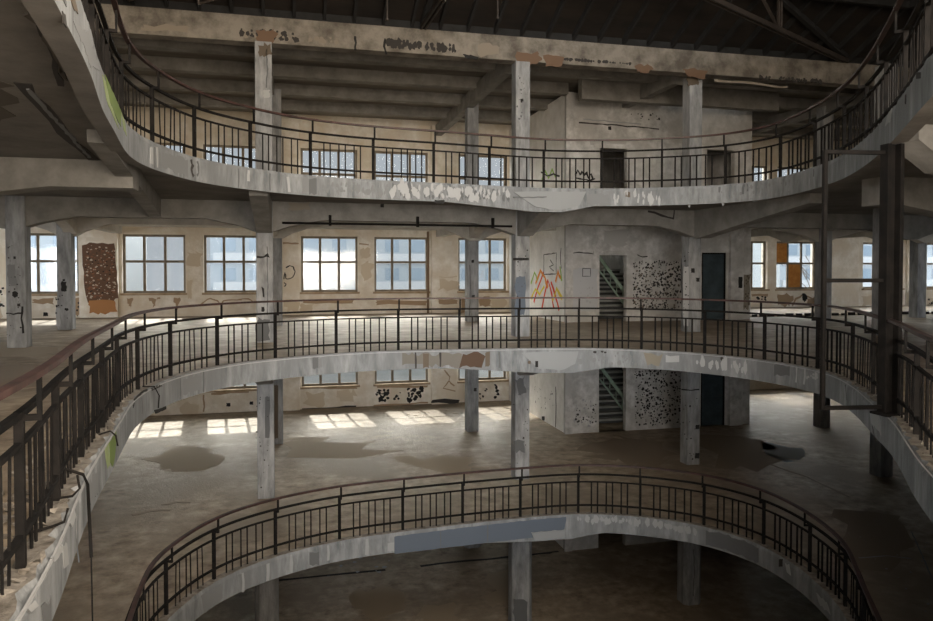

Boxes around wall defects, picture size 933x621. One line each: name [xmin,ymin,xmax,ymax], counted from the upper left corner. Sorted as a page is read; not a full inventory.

leakage [143,445,225,472]